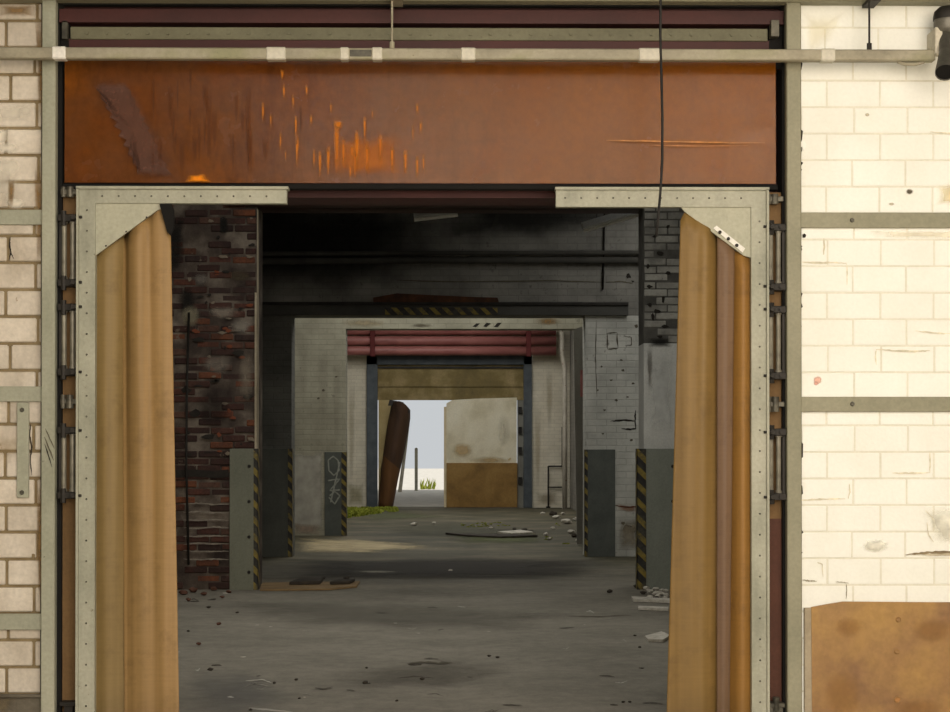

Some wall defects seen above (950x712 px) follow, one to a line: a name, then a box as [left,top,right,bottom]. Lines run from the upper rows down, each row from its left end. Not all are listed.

rust [313,111,424,175]
crack [907,549,950,557]